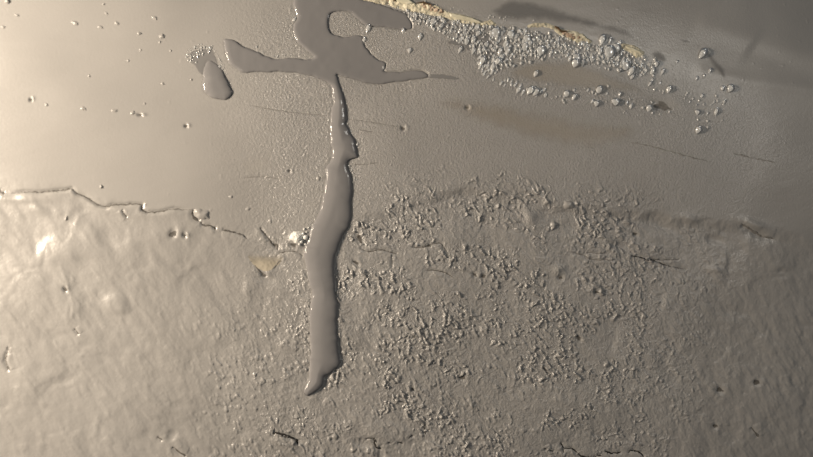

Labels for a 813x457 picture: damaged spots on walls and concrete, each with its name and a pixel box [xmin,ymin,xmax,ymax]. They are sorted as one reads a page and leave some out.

spalling [364,0,496,27]
leakage [189,49,233,100]
leakage [289,231,304,244]
crack [545,443,644,457]